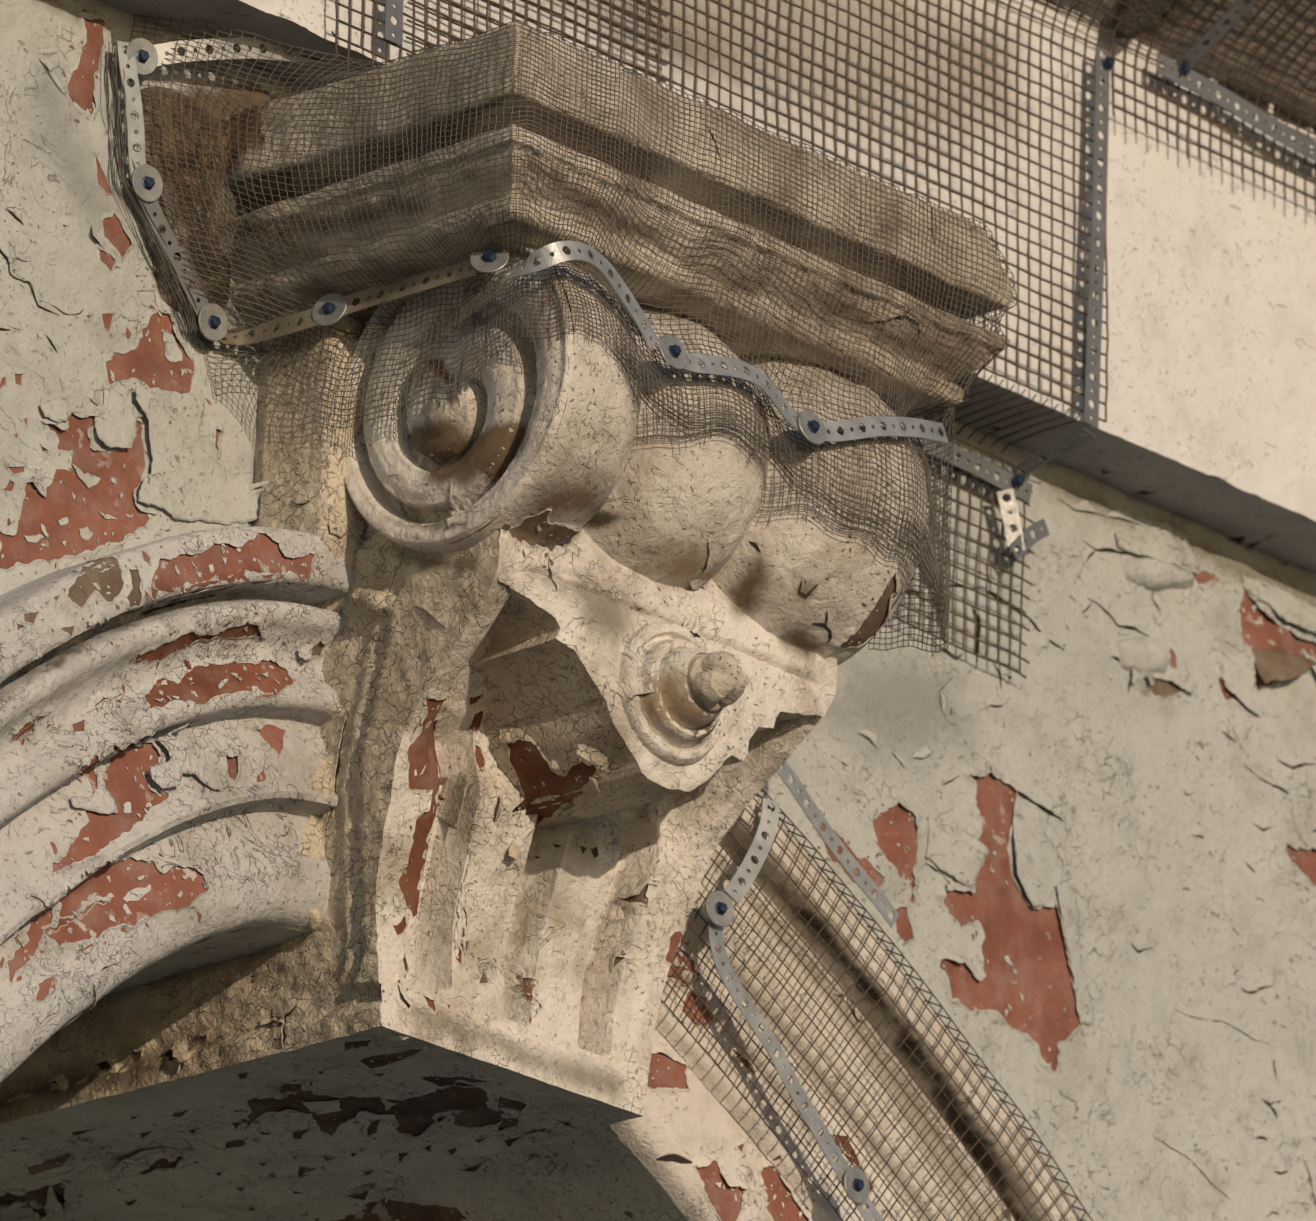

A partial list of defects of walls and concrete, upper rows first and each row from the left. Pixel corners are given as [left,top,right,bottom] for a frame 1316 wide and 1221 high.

peeling [62,9,108,123]
crack [0,199,84,353]
peeling [0,304,323,1001]
peeling [297,631,333,661]
peeling [1115,520,1316,718]
peeling [391,687,610,1014]
peeling [805,759,1094,1074]
peeling [231,1071,527,1172]
peeling [315,1170,476,1221]
peeling [691,1143,814,1221]